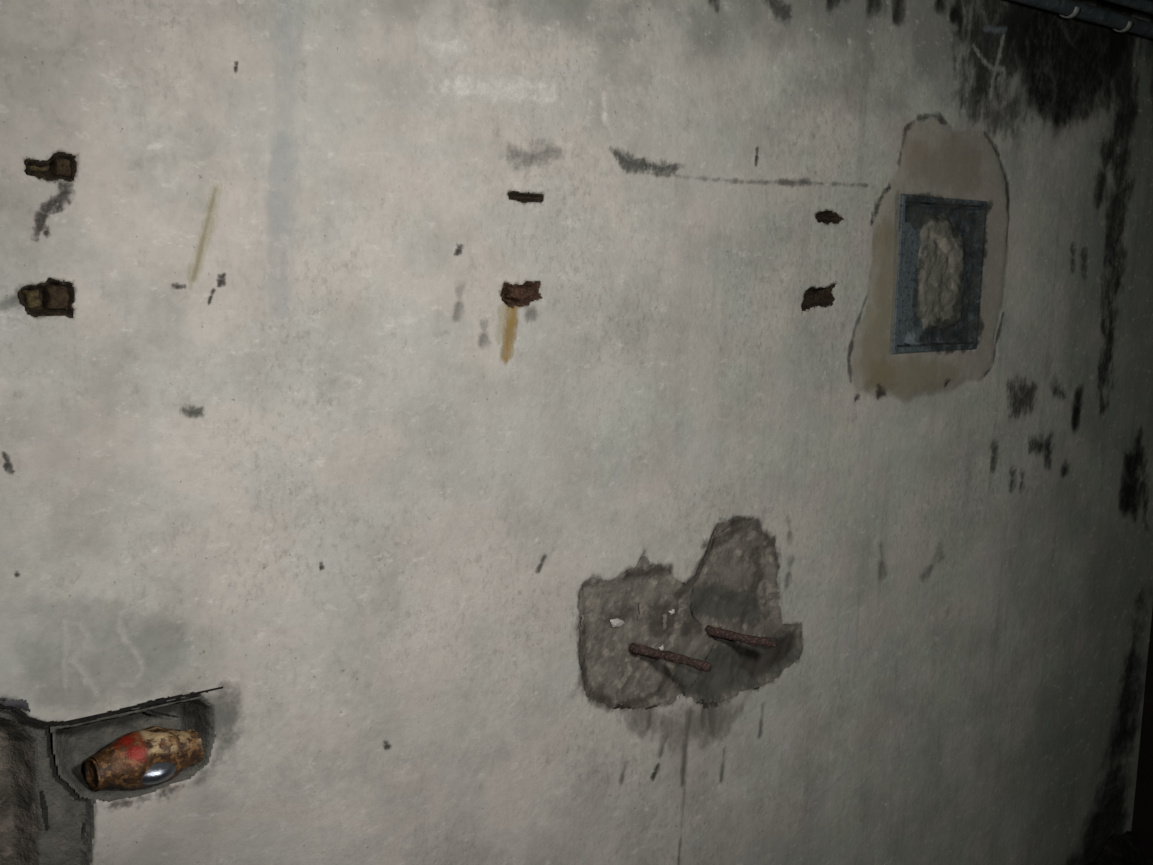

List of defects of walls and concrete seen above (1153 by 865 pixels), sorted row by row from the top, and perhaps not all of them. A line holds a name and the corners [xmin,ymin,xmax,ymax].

water stain [936,0,1153,412]
rust [499,300,517,361]
water stain [1010,384,1037,417]
water stain [1120,430,1147,518]
flaking render [577,516,803,708]
flaking render [0,696,216,865]